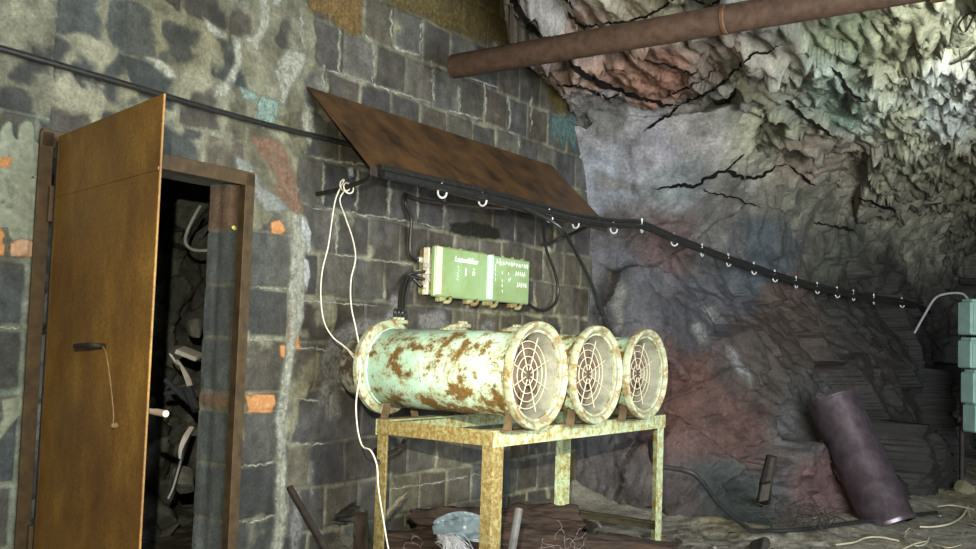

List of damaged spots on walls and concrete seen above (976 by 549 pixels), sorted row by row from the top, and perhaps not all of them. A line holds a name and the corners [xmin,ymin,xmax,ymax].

peeling [0,120,39,257]
crack [653,155,816,207]